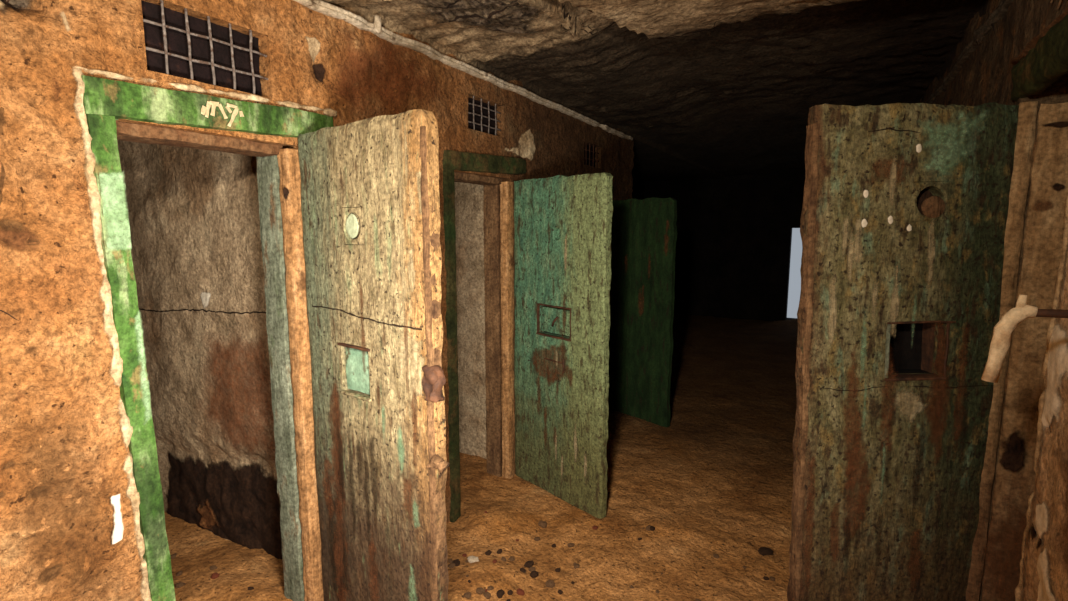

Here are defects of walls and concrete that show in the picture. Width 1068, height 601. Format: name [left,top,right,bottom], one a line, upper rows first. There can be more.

crack [139,307,266,315]
rust [532,346,572,443]
flaking render [1042,325,1068,432]
rust [324,384,345,520]
flaking render [1030,502,1056,601]